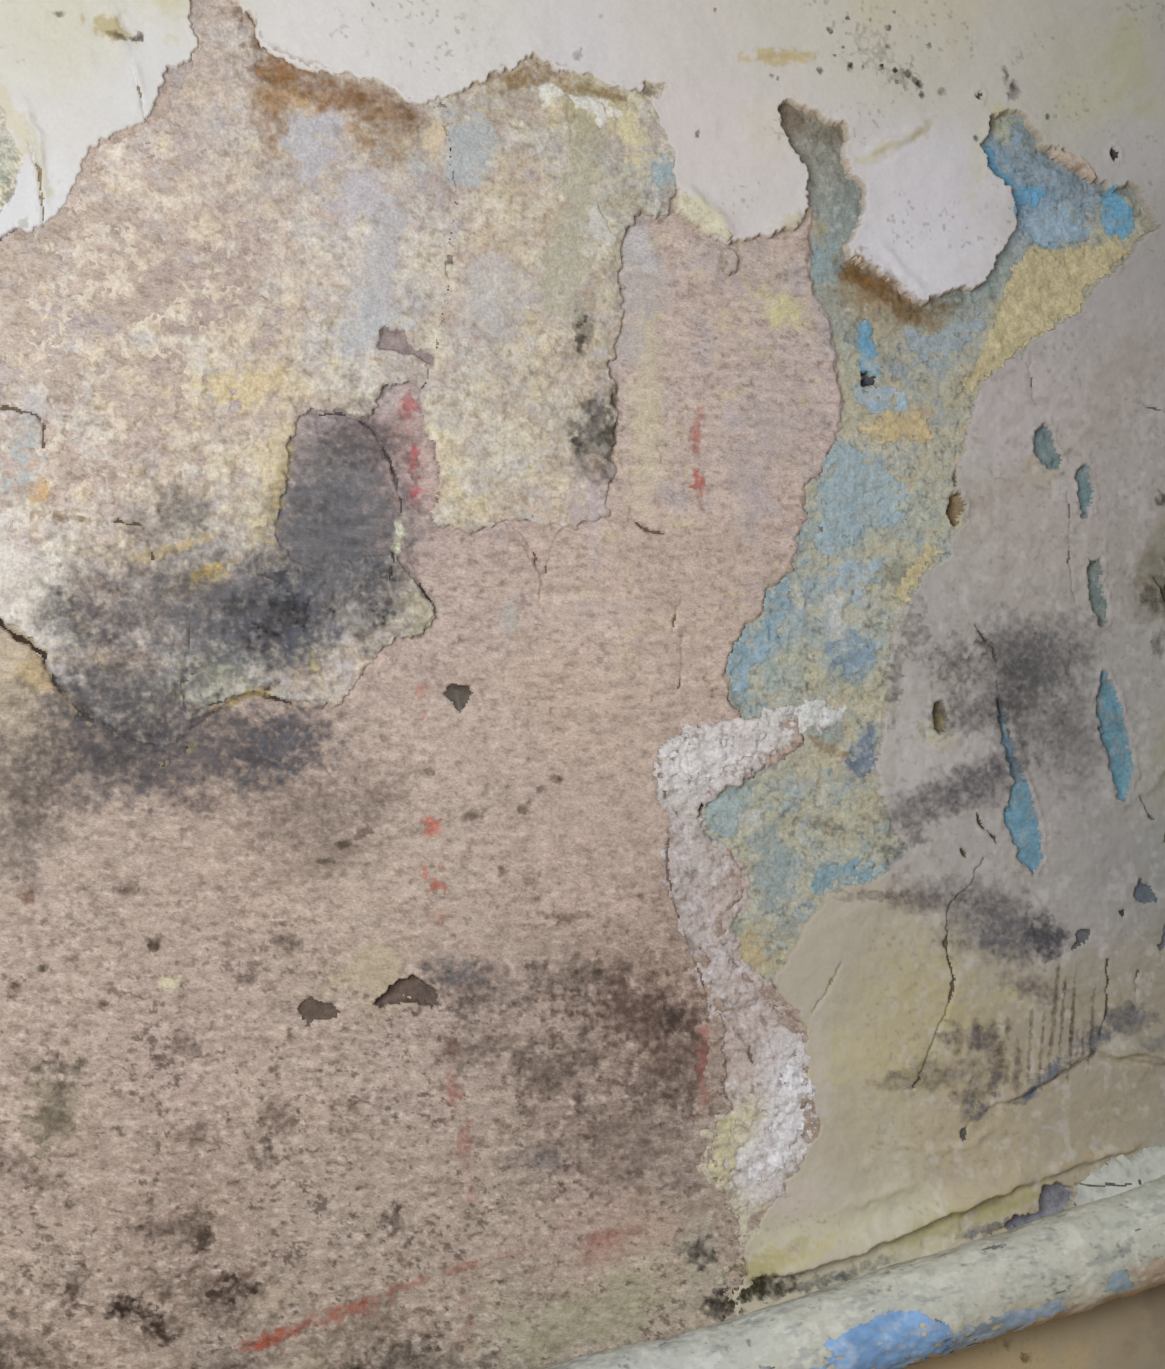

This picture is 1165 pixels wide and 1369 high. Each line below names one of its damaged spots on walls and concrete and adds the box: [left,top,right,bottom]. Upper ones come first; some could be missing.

rust [255,45,384,133]
crack [0,405,46,449]
peeling [698,103,1157,982]
leakage [14,418,412,807]
spalling [0,0,847,1369]
crack [960,814,996,858]
crack [942,930,956,1003]
crack [1104,959,1139,1019]
leakage [565,964,706,1118]
mould [370,1321,458,1369]